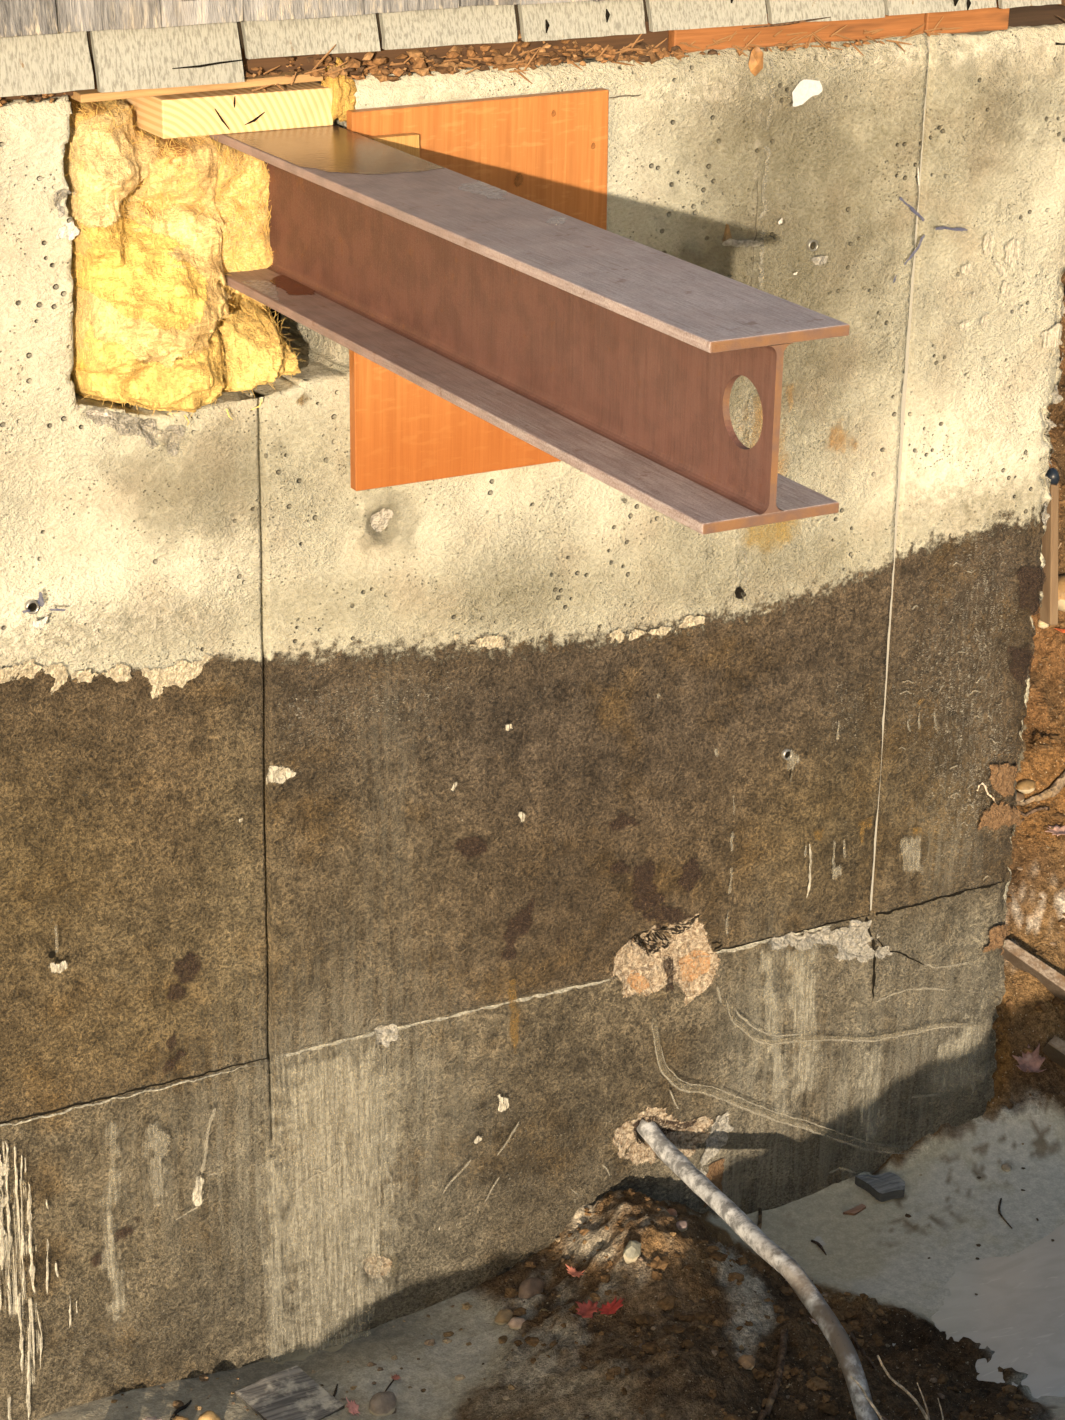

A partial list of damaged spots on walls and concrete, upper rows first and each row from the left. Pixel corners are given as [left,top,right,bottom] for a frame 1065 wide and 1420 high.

damp [0,506,1046,1420]
spalling [610,858,720,1005]
spalling [613,1107,734,1193]